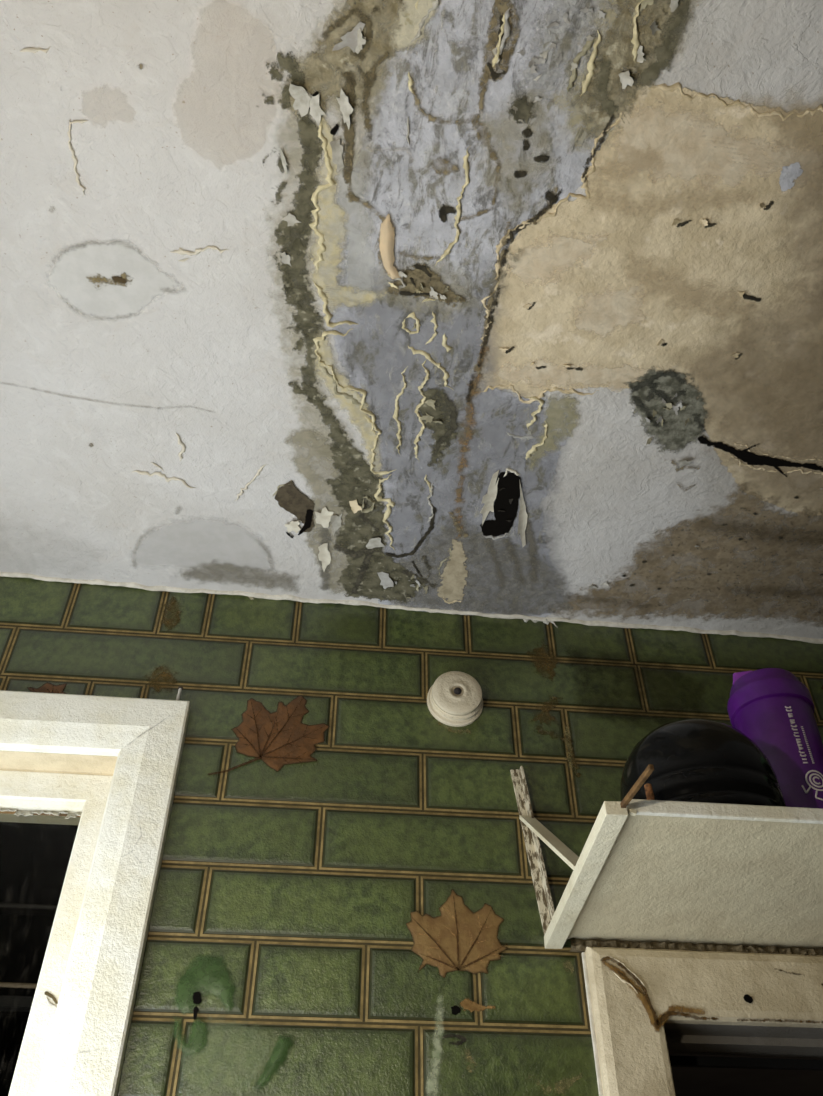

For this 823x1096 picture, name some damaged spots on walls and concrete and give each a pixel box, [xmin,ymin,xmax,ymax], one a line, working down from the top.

hole [273,480,334,590]
damp [263,0,823,627]
peeling [330,0,823,628]
crack [698,436,823,477]